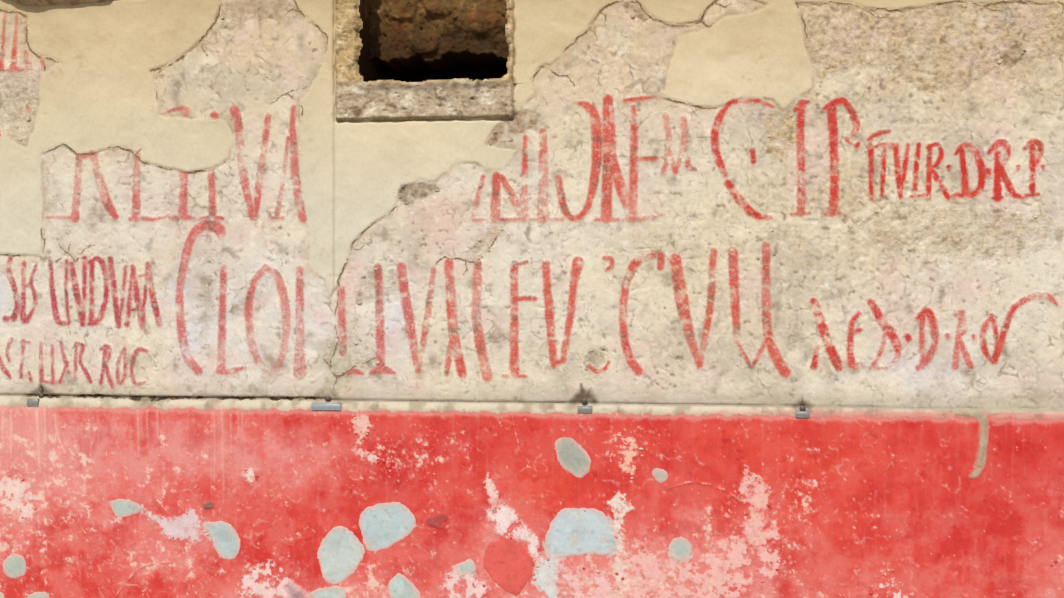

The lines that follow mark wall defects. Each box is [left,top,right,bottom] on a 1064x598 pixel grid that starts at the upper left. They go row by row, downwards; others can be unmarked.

spalling [0,76,39,145]
spalling [483,106,555,149]
spalling [394,179,444,207]
spalling [460,224,508,259]
crack [24,204,399,404]
peeling [343,407,389,472]
peeling [0,466,43,528]
peeling [135,499,214,549]
peeling [234,463,263,489]
peeling [478,427,792,598]
peeling [233,553,311,598]
peeling [435,565,498,598]